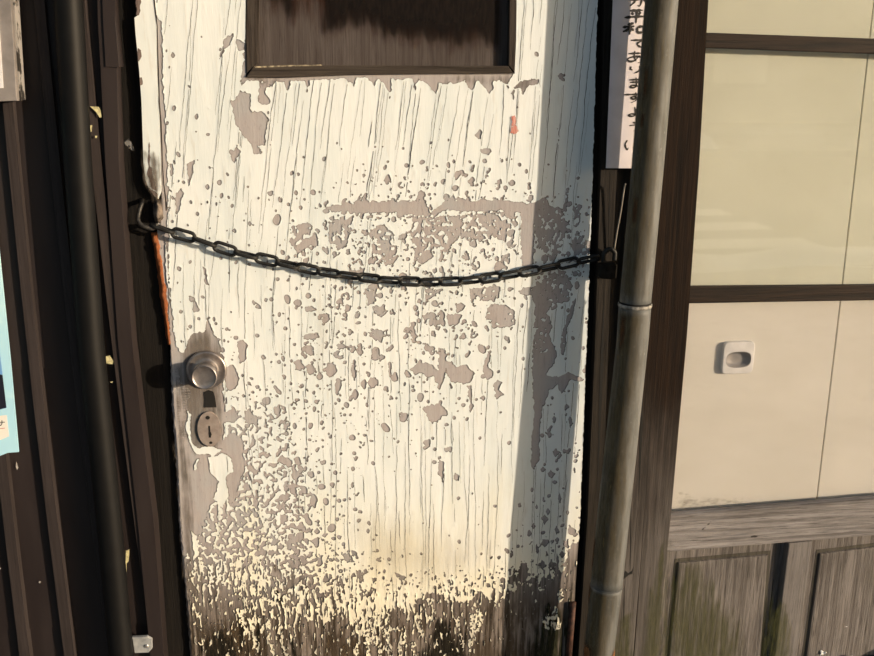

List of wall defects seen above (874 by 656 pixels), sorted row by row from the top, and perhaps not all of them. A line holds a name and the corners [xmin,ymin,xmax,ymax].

peeling [146,17,590,656]
damp [198,608,266,656]
damp [340,636,365,656]
damp [419,618,467,656]
damp [527,597,571,656]